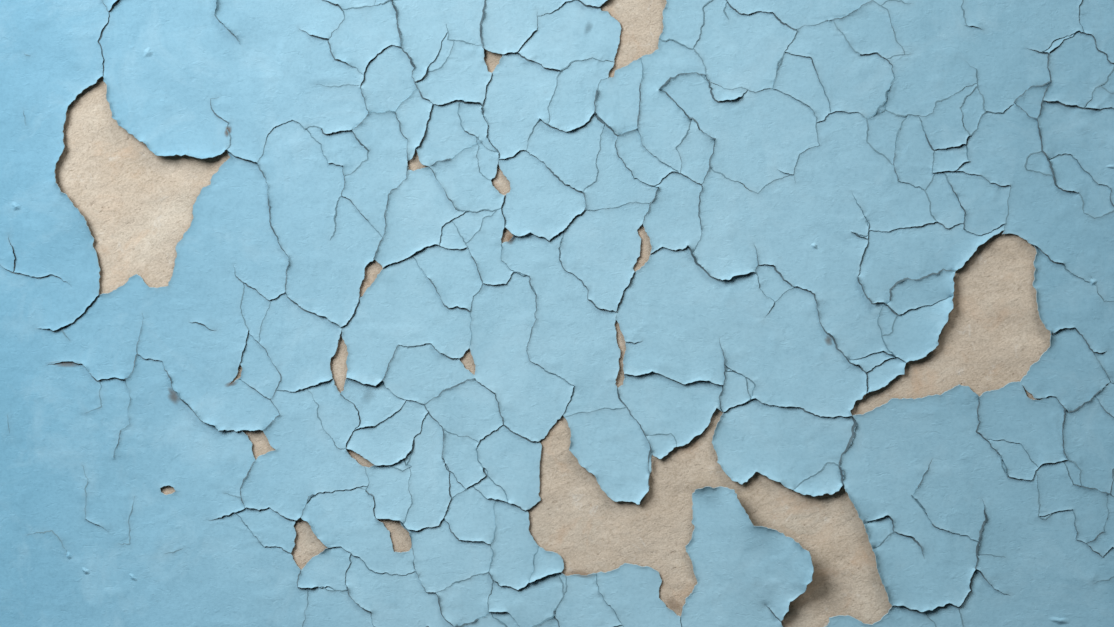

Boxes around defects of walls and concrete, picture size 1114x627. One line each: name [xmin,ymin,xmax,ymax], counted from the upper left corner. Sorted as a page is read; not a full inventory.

crack [97,0,120,76]
peeling [596,0,673,79]
peeling [49,71,236,296]
crack [2,238,241,461]
peeling [845,225,1056,419]
crack [210,458,376,554]
peeling [290,511,334,570]
peeling [371,513,416,553]
crack [596,573,624,627]
peeling [528,402,897,627]
crack [865,460,1008,627]
crack [975,324,1114,582]